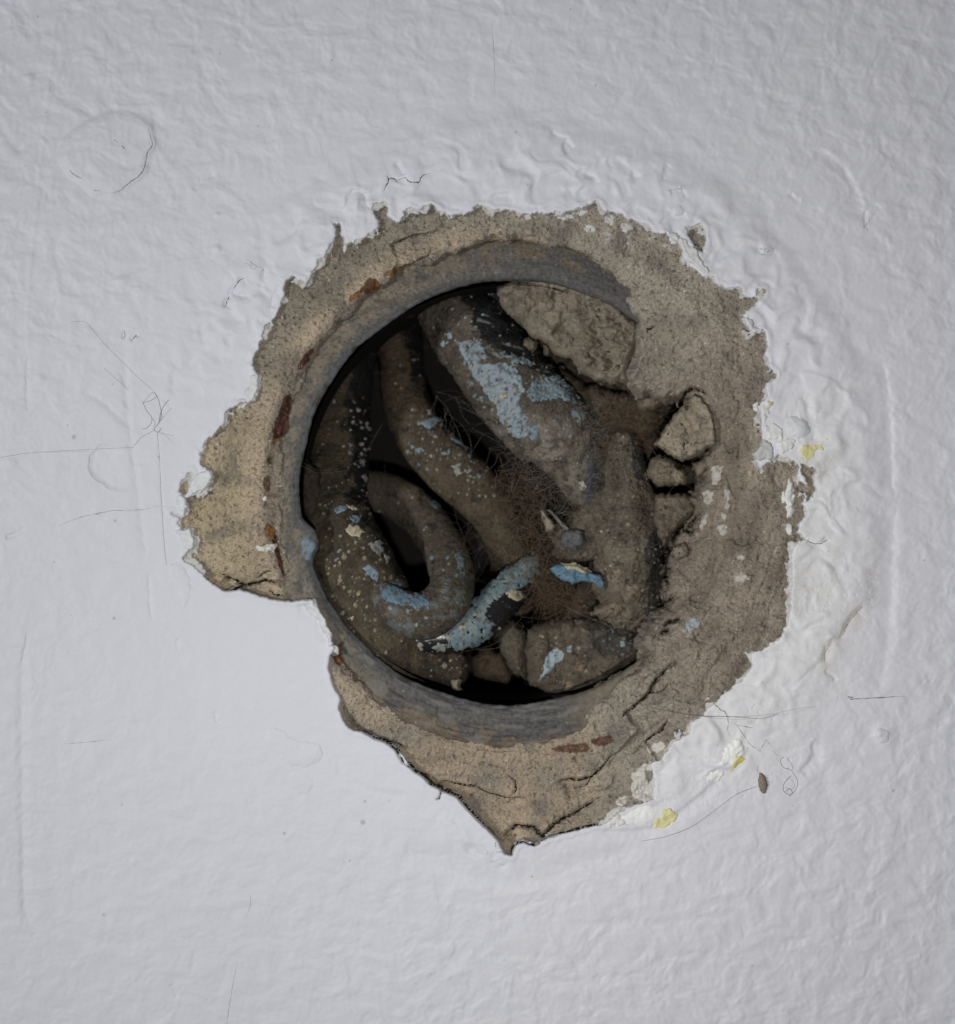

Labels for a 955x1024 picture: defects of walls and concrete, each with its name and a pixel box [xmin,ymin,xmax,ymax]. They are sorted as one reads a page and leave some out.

corrosion [349,255,428,301]
corrosion [272,395,292,443]
flaking render [175,203,892,853]
crack [621,660,678,718]
corrosion [552,736,612,753]
crack [346,710,668,854]